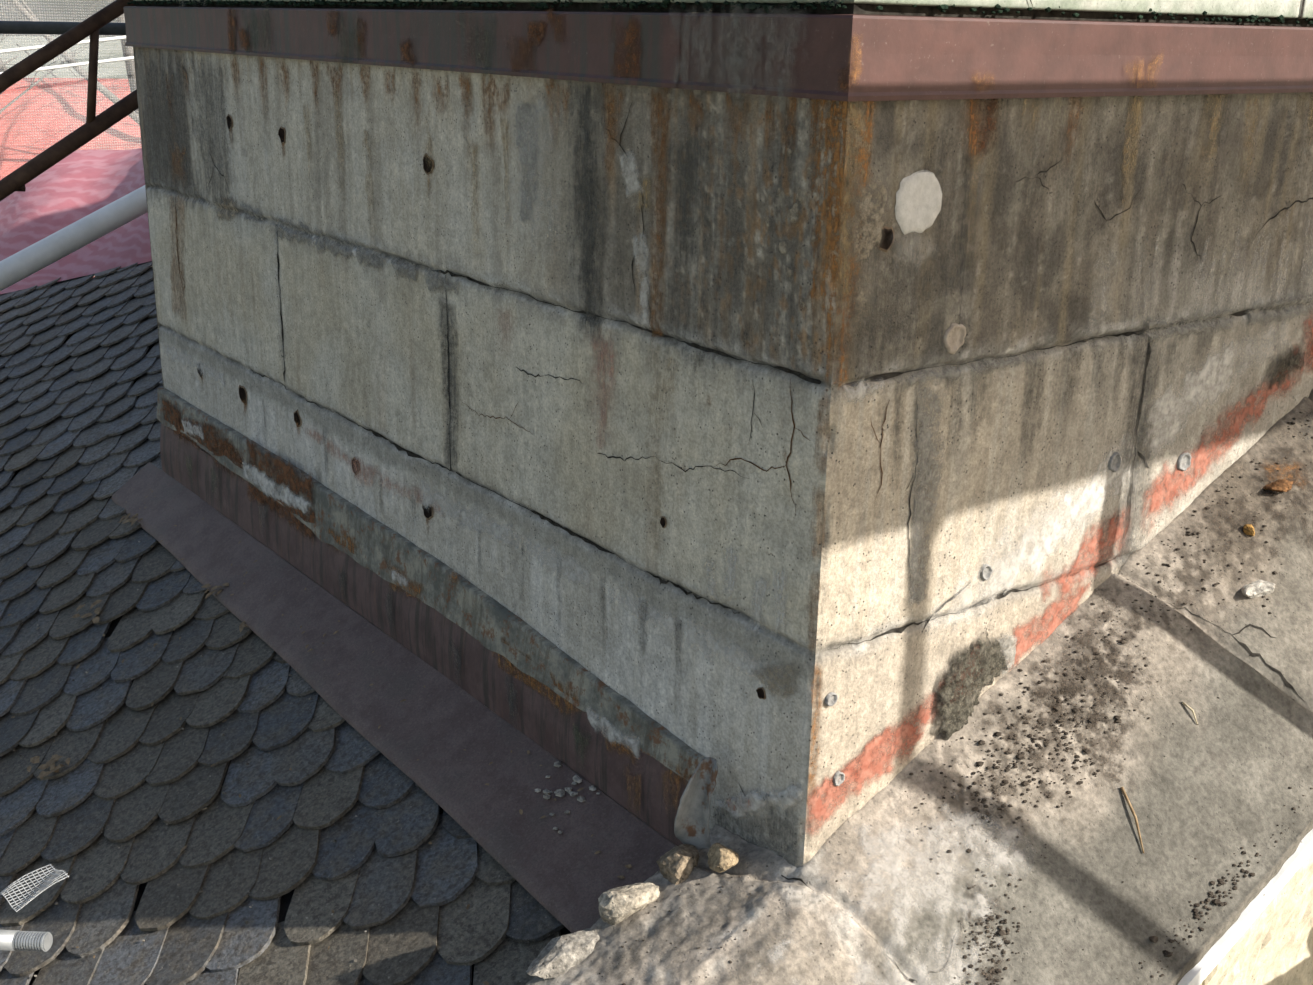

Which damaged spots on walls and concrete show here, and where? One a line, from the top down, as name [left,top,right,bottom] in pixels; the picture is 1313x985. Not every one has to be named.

rust [400,40,509,148]
water stain [570,81,613,374]
rust [765,38,874,387]
rust [162,400,315,539]
crack [252,106,1313,711]
water stain [985,331,1271,597]
rust [809,667,821,795]